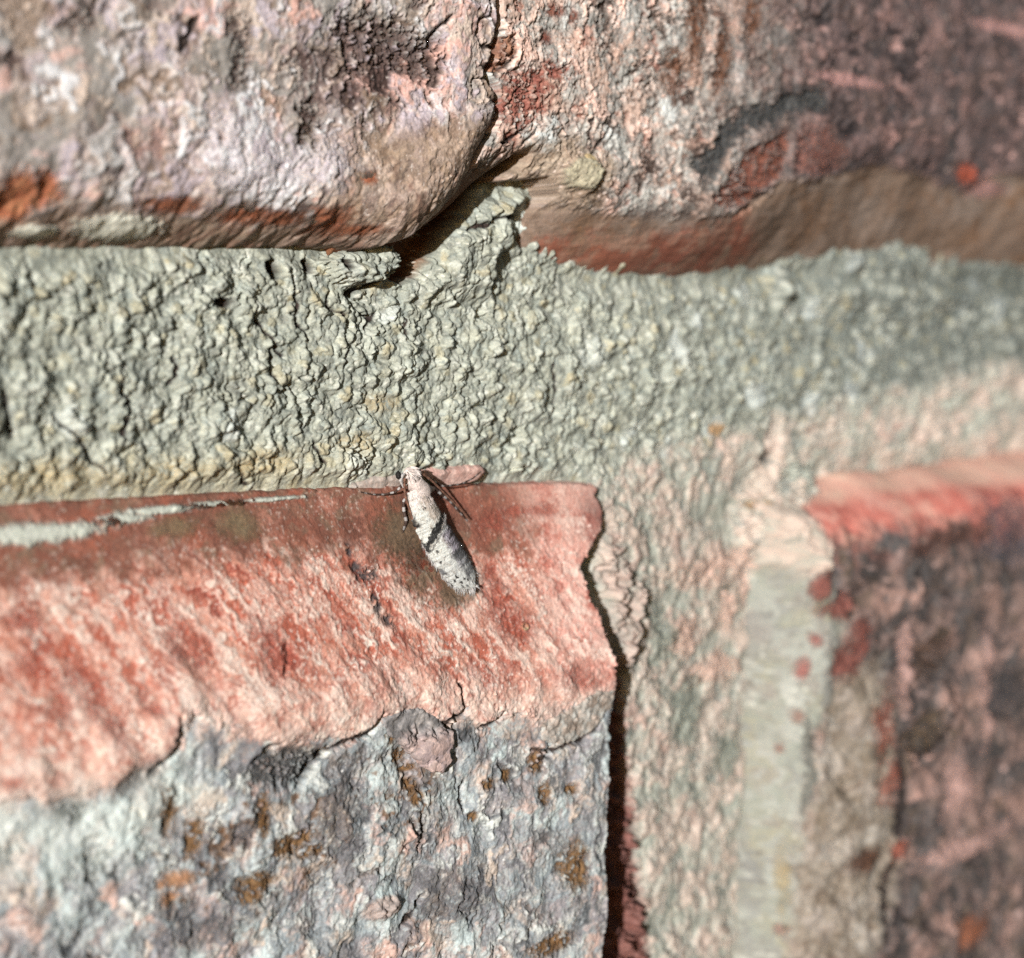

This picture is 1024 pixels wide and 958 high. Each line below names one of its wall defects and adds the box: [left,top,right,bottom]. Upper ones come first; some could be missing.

peeling [540,690,615,746]
peeling [382,708,455,774]
spalling [114,760,162,799]
spalling [247,746,317,786]
spalling [55,802,88,822]